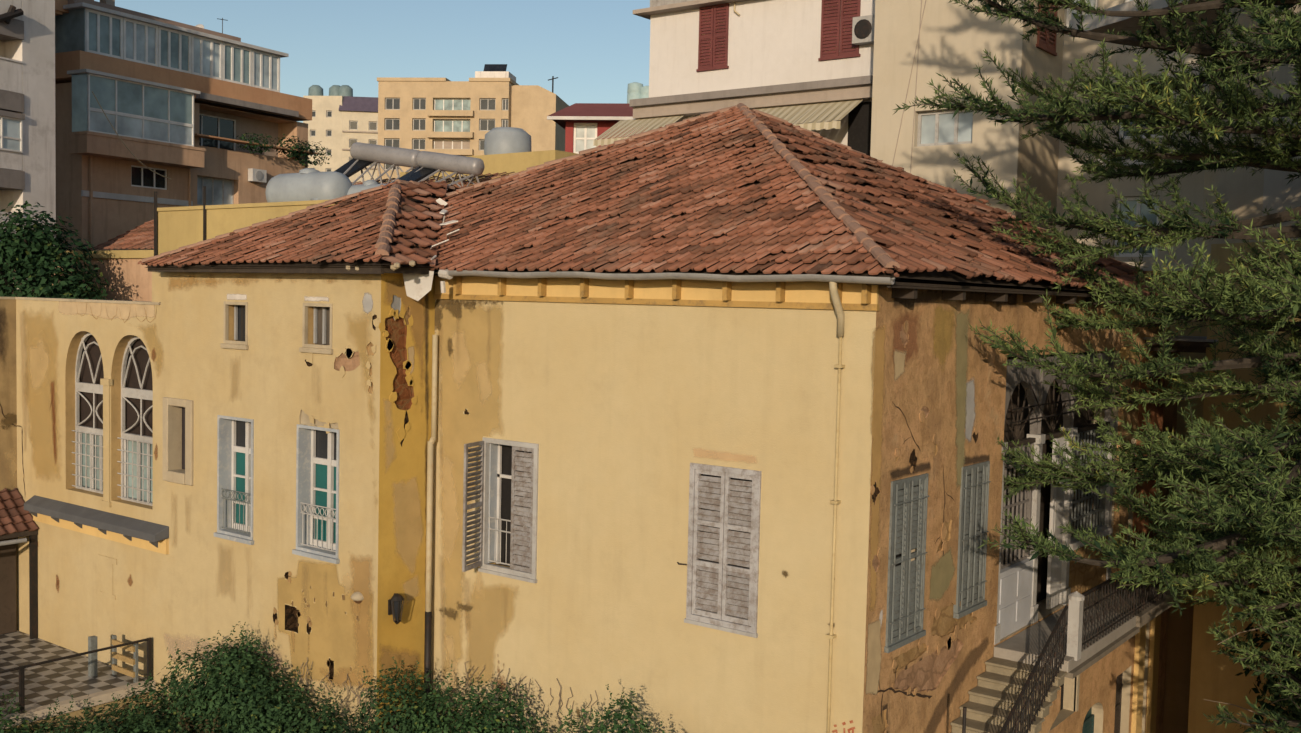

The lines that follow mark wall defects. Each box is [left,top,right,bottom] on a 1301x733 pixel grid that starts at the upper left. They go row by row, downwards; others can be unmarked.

flaking render [334,295,417,446]
leakage [387,282,513,683]
spalling [273,571,360,635]